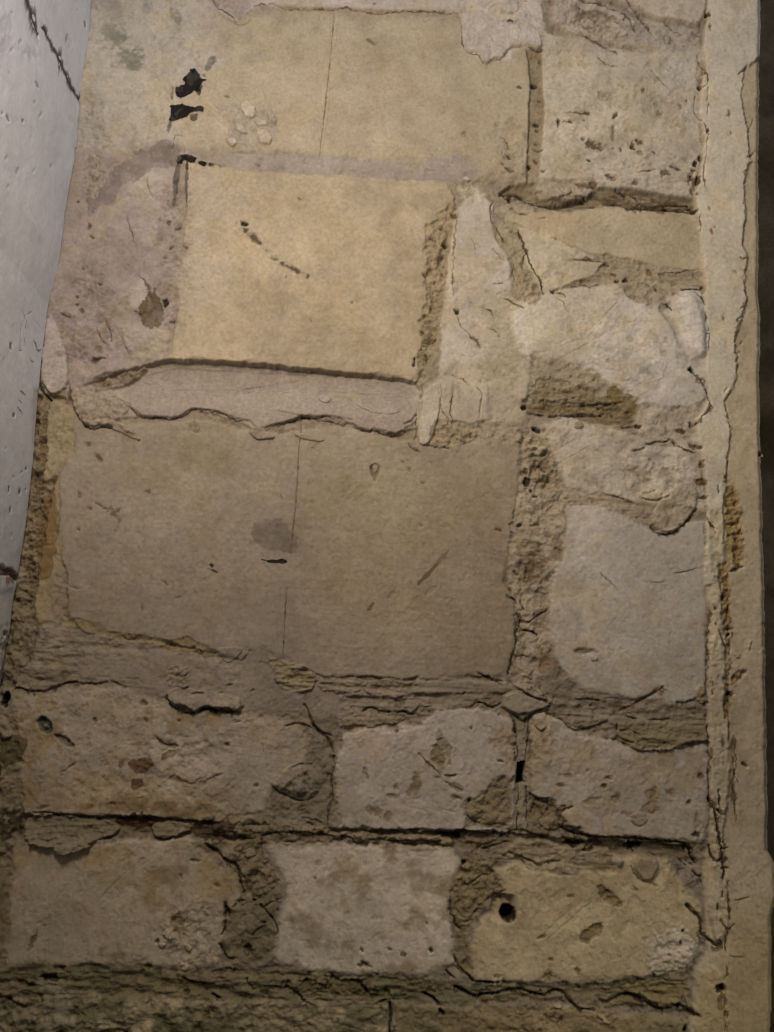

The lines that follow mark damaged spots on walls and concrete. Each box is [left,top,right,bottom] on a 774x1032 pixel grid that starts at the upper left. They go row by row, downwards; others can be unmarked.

crack [212,0,605,346]
peeling [458,0,544,65]
crack [27,585,747,1032]